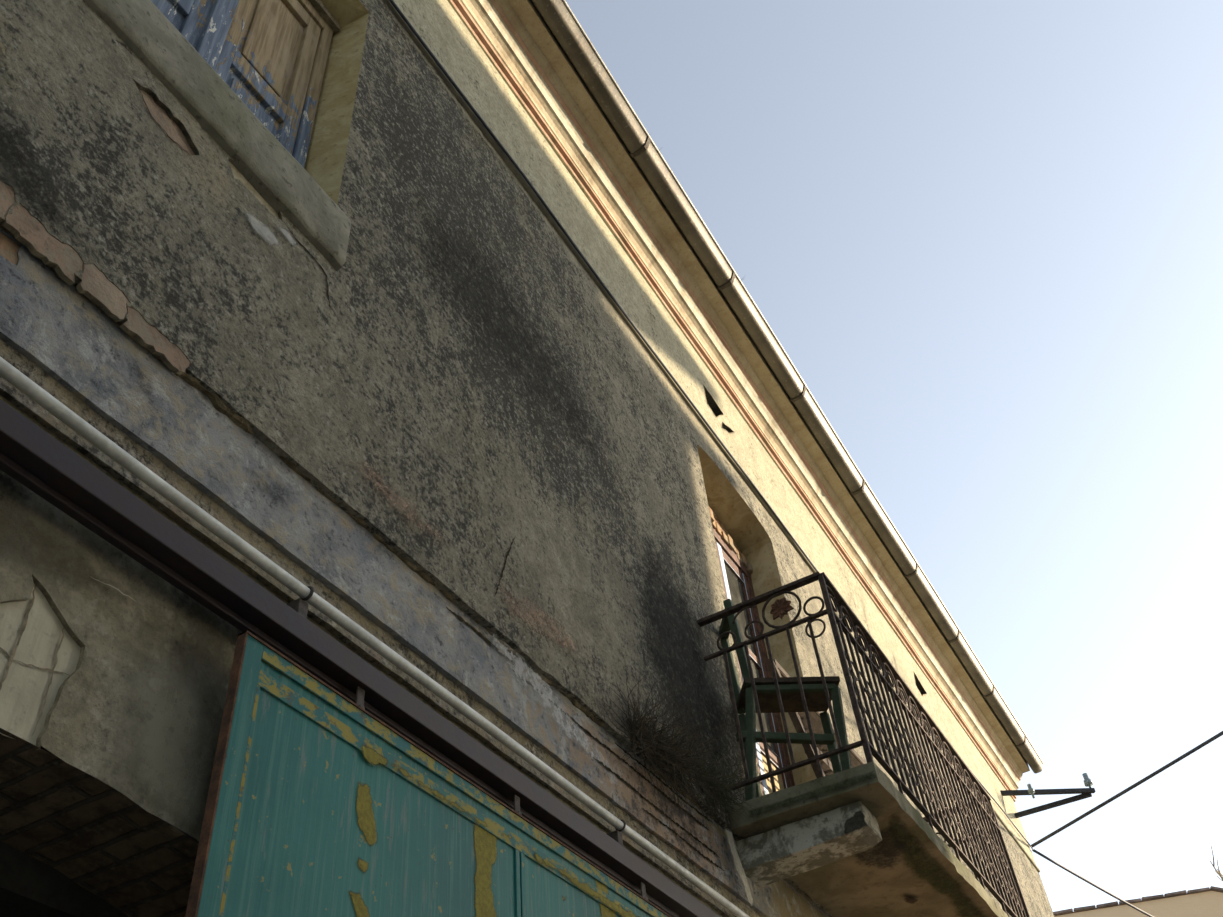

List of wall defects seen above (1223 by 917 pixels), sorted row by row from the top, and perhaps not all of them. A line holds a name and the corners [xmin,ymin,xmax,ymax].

spalling [134,81,199,156]
flaking render [0,180,190,375]
water stain [422,224,594,445]
water stain [643,544,725,781]
peeling [349,891,369,917]
peeling [356,783,377,845]
peeling [362,745,512,917]
peeling [535,853,636,917]